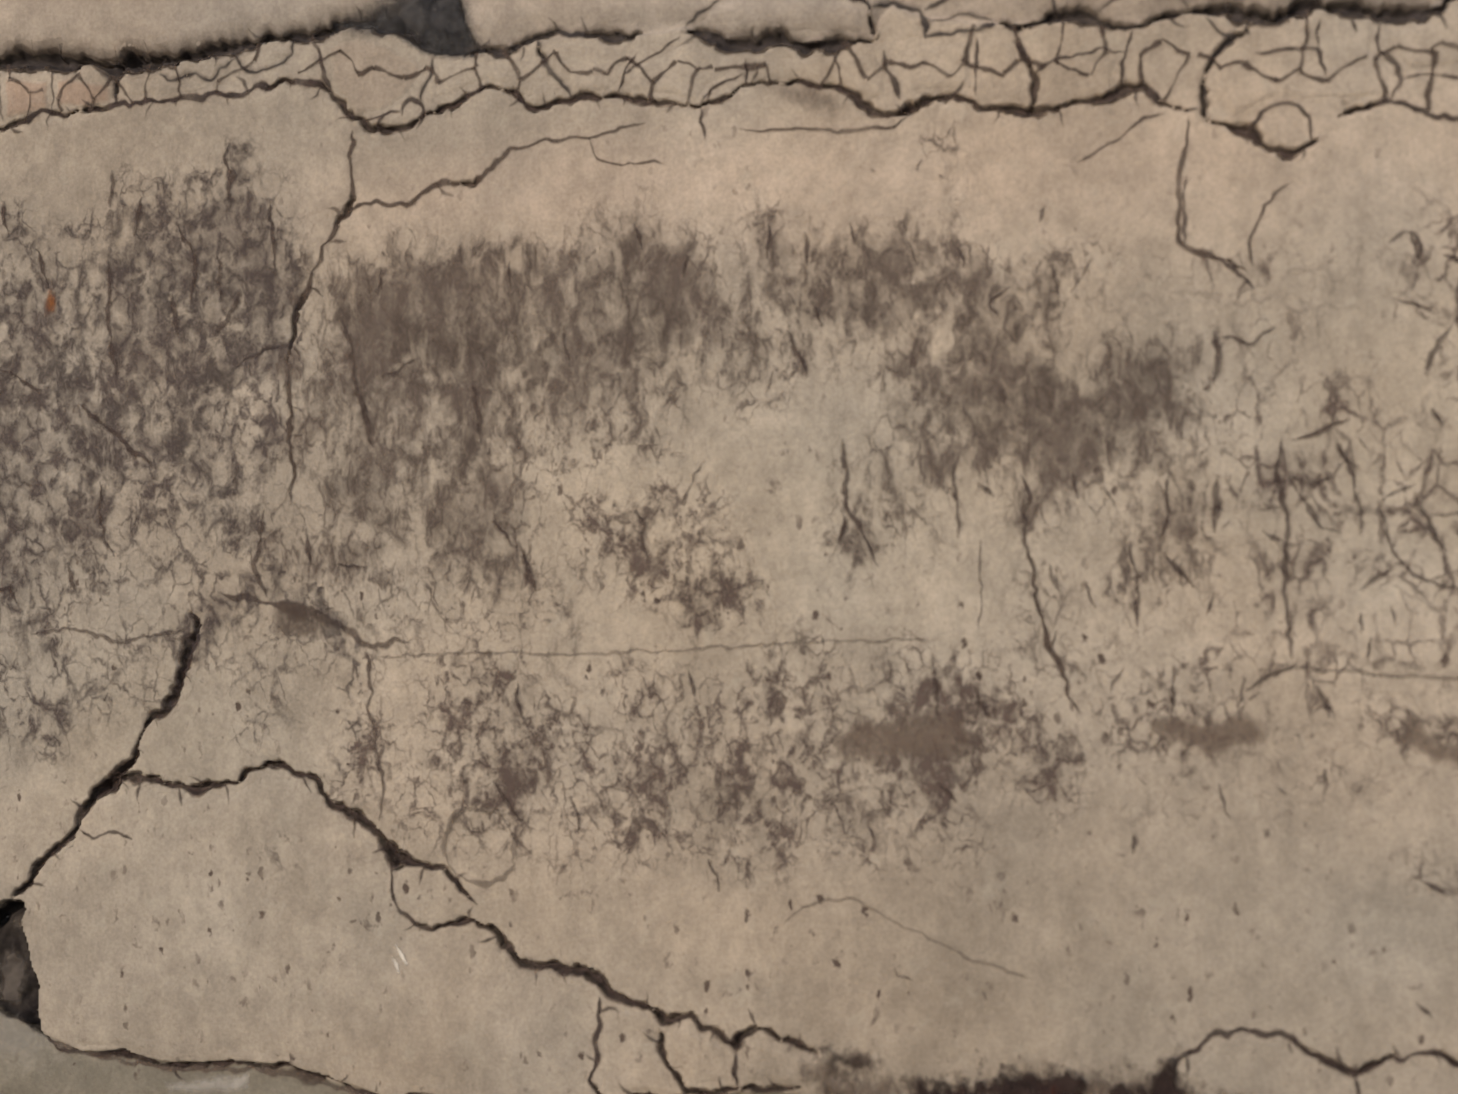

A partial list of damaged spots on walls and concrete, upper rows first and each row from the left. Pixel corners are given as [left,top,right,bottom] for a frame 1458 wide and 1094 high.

crack [0,0,1458,500]
water stain [1395,217,1458,323]
water stain [0,144,807,754]
water stain [753,211,1363,644]
water stain [1360,453,1458,595]
water stain [339,719,390,800]
water stain [410,637,1085,870]
water stain [1112,650,1349,755]
crack [15,593,815,1094]
spalling [0,900,50,1037]
spalling [801,1047,1194,1094]
crack [1173,1027,1458,1094]